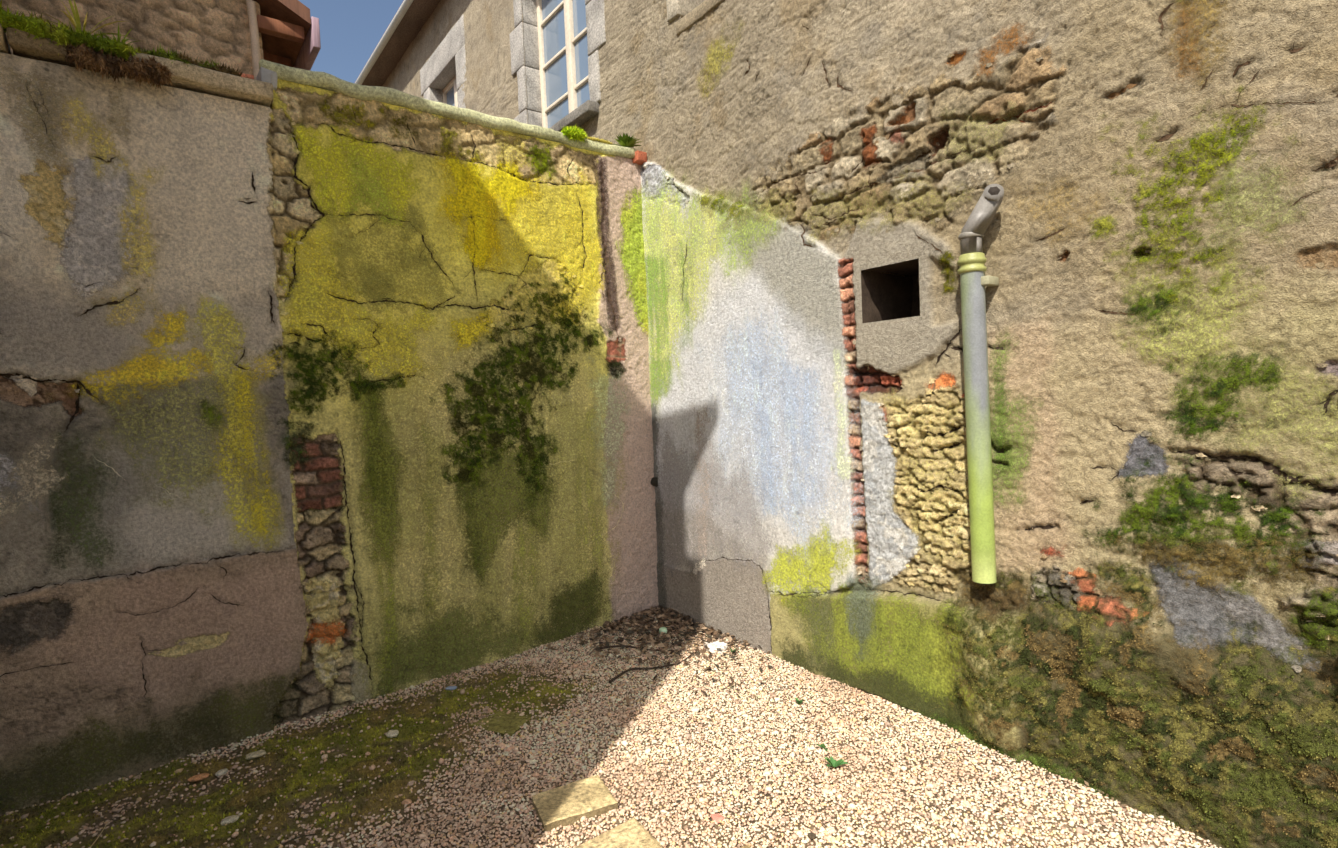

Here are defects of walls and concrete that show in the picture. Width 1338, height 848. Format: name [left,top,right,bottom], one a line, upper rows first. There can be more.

crack [268,103,619,349]
water stain [593,160,620,335]
spalling [751,33,1067,240]
crack [1106,83,1137,99]
crack [1158,41,1338,141]
crack [1291,157,1338,206]
crack [0,373,106,432]
spalling [838,258,975,594]
spalling [273,433,361,726]
water stain [797,575,879,685]
flaking render [1030,547,1149,626]
spalling [1172,452,1338,672]